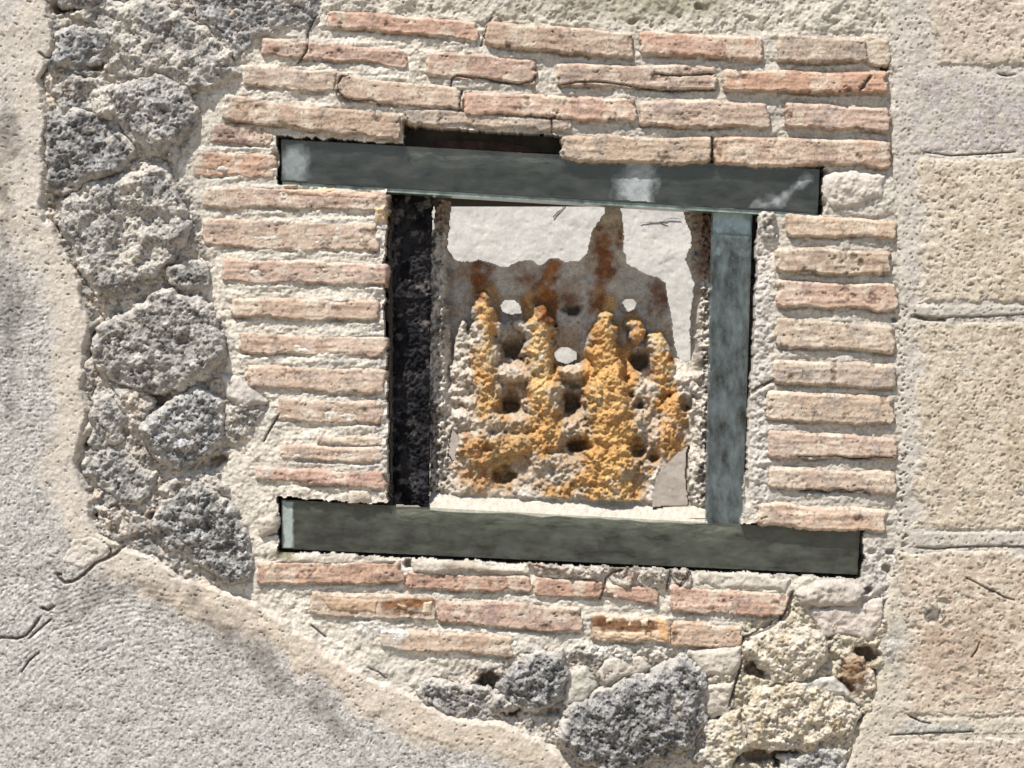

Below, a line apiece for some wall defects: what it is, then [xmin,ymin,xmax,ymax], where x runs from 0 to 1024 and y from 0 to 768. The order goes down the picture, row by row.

rust [454,226,686,502]
crack [56,547,123,583]
peeling [63,516,121,568]
crack [0,606,54,672]